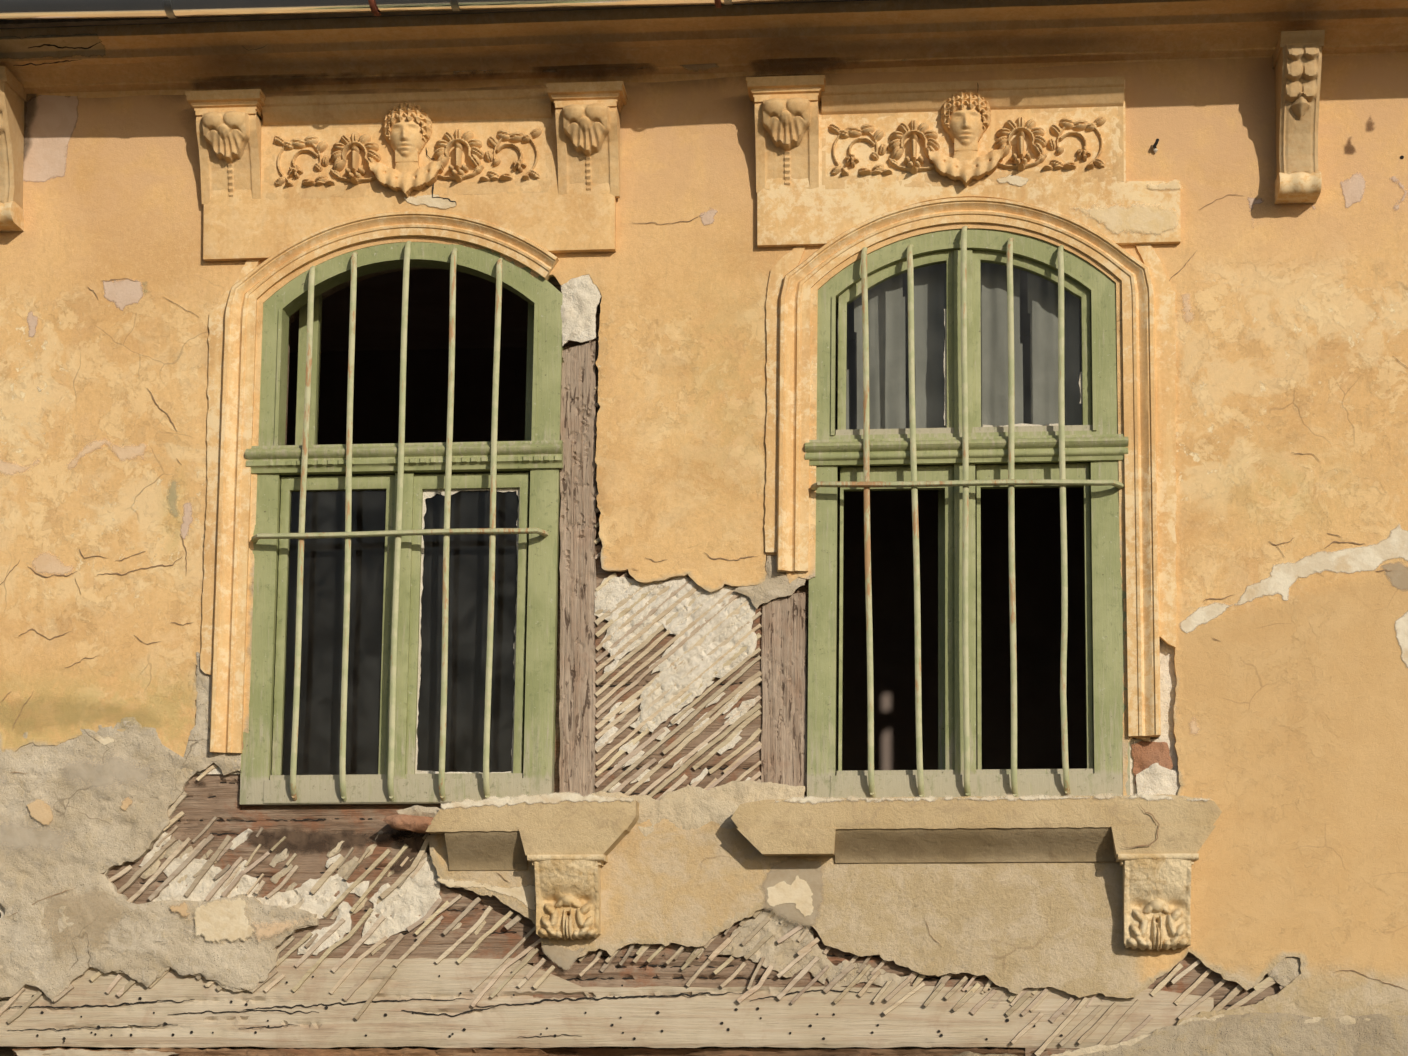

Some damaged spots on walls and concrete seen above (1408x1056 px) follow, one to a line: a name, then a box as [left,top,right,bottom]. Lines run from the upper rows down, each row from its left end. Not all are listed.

peeling [23,95,79,182]
peeling [1341,173,1365,208]
peeling [103,279,144,310]
spalling [560,274,602,347]
crack [147,388,182,465]
crack [0,534,187,593]
spalling [592,385,806,836]
crack [19,628,96,668]
peeling [0,637,1301,1056]